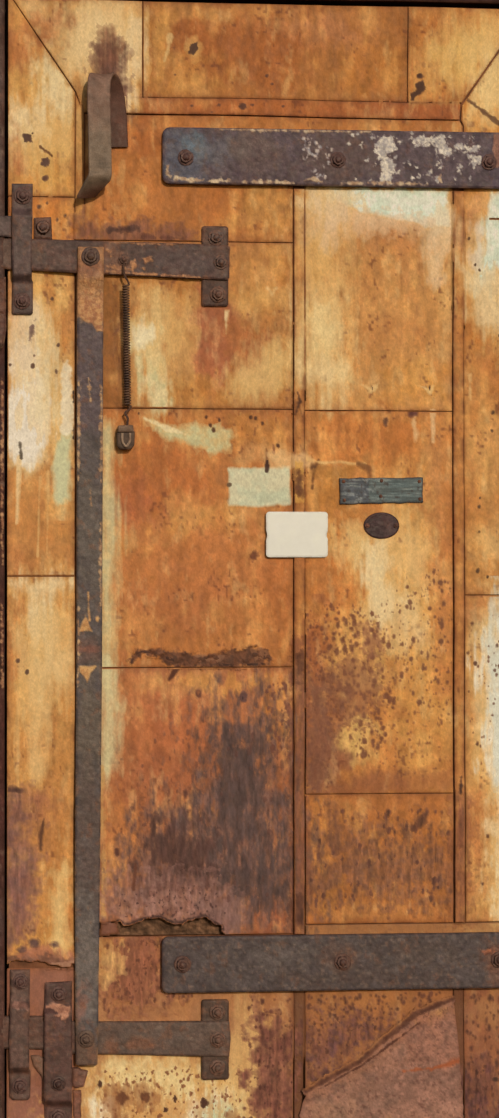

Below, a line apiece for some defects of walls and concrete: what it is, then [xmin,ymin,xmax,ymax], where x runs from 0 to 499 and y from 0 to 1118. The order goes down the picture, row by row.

corrosion [98,632,489,1021]
corrosion [8,1068,44,1118]
corrosion [232,989,442,1118]
corrosion [460,992,499,1118]